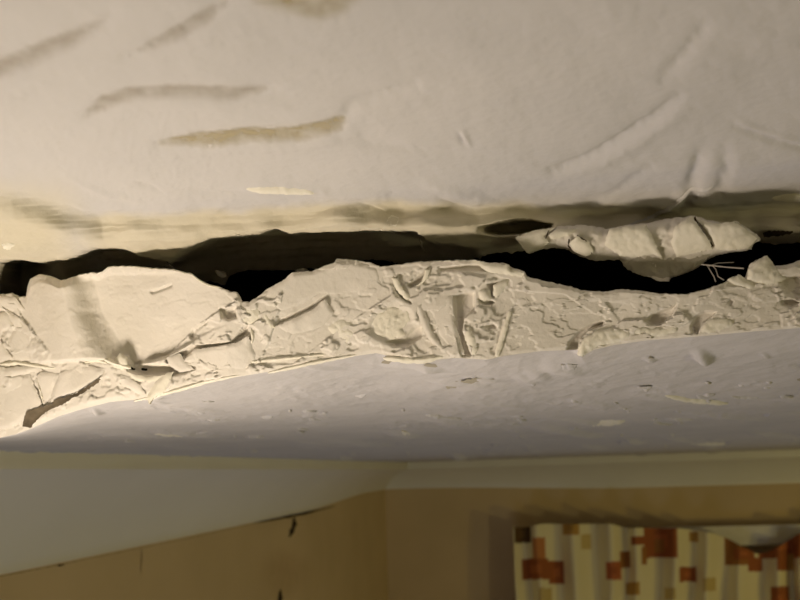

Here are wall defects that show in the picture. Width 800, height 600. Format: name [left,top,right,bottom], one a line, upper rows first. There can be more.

water stain [180,129,275,142]
flaking render [0,256,800,438]